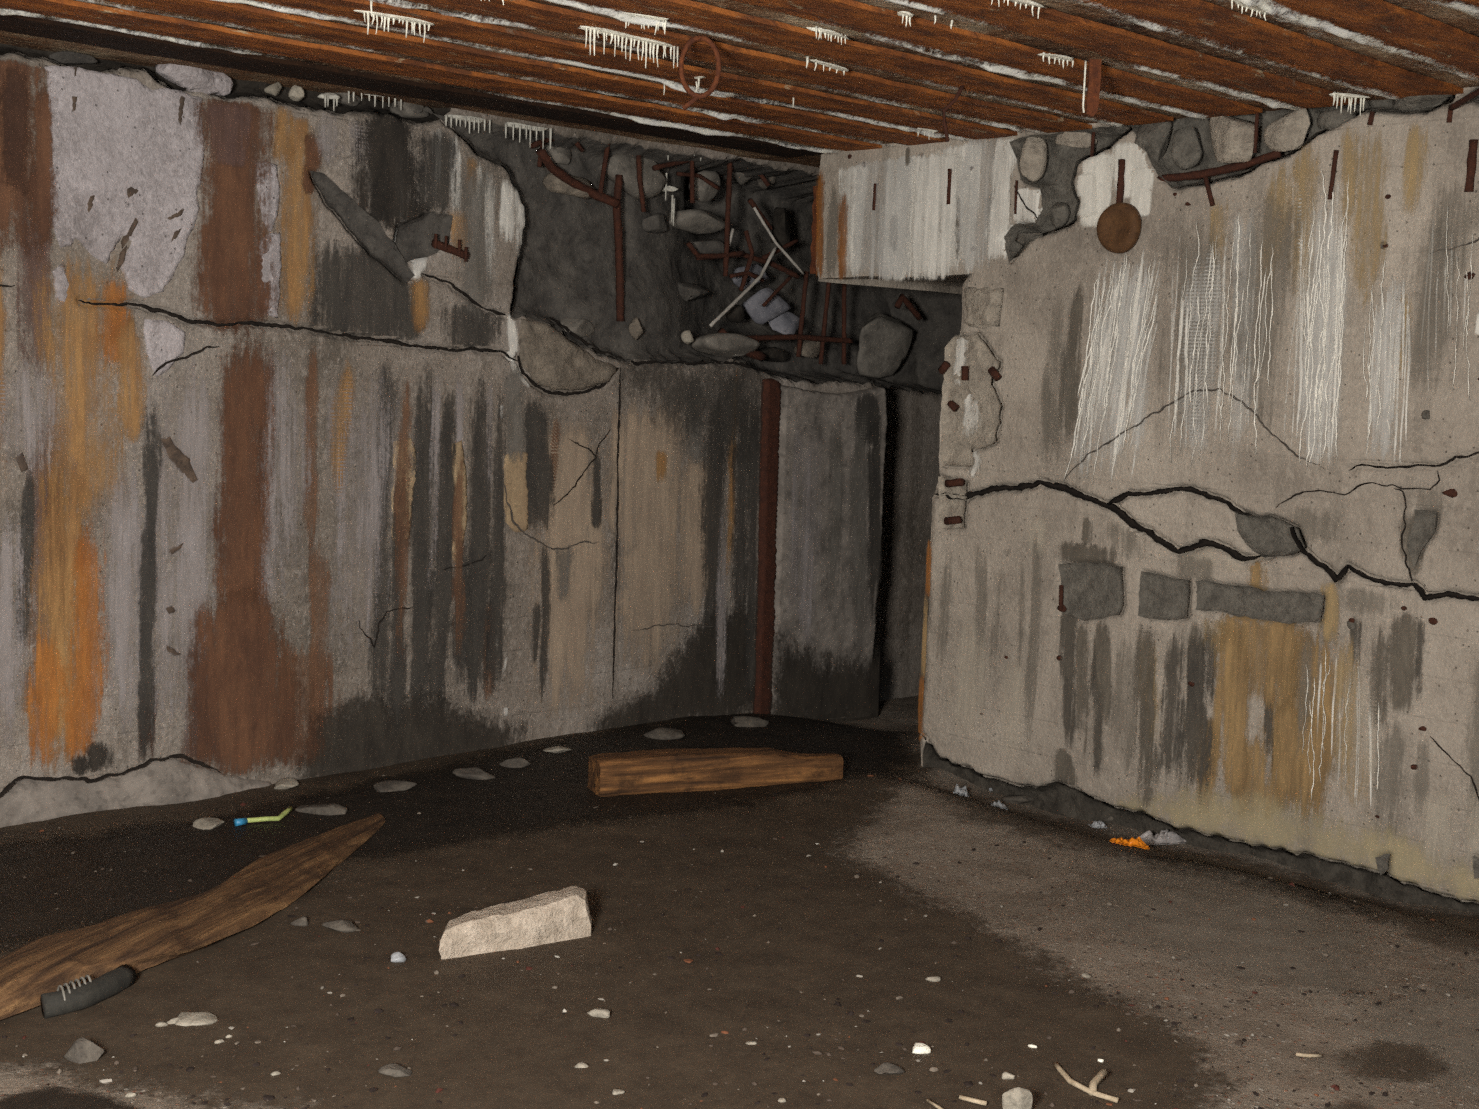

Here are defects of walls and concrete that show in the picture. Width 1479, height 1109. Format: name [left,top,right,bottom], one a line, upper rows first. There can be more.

corrosion [0,60,145,762]
corrosion [185,98,353,775]
crack [78,273,763,699]
water stain [310,111,554,722]
spalling [0,43,1004,542]
water stain [212,0,1043,280]
water stain [1043,169,1349,484]
crack [935,388,1479,601]
spalling [1004,88,1479,262]
corrosion [1343,127,1427,302]
crack [0,754,220,797]
water stain [0,713,1479,1109]